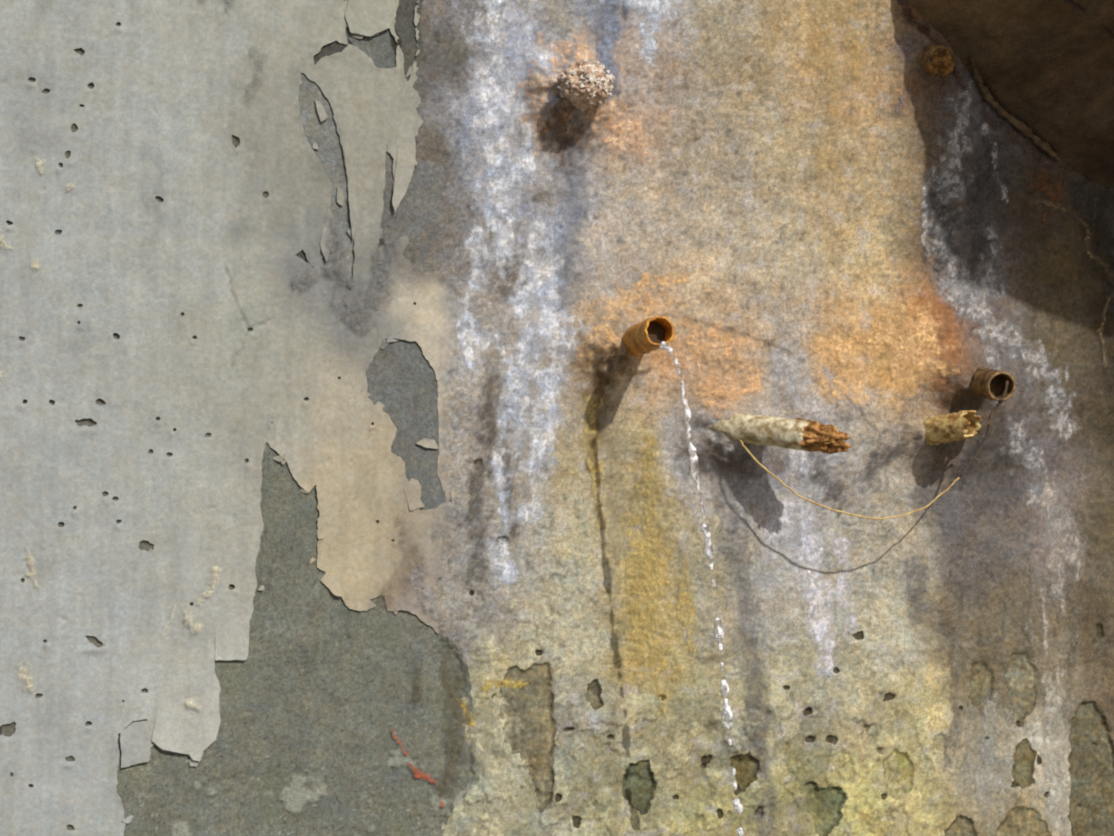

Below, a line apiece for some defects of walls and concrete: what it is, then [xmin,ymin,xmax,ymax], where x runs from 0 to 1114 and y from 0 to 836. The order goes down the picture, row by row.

peeling [117,442,480,836]
peeling [296,0,424,291]
peeling [360,335,452,511]
peeling [378,125,445,247]
damp [456,0,584,588]
rust [518,36,648,173]
rust [663,320,762,417]
damp [921,68,1076,440]
damp [914,416,1085,660]